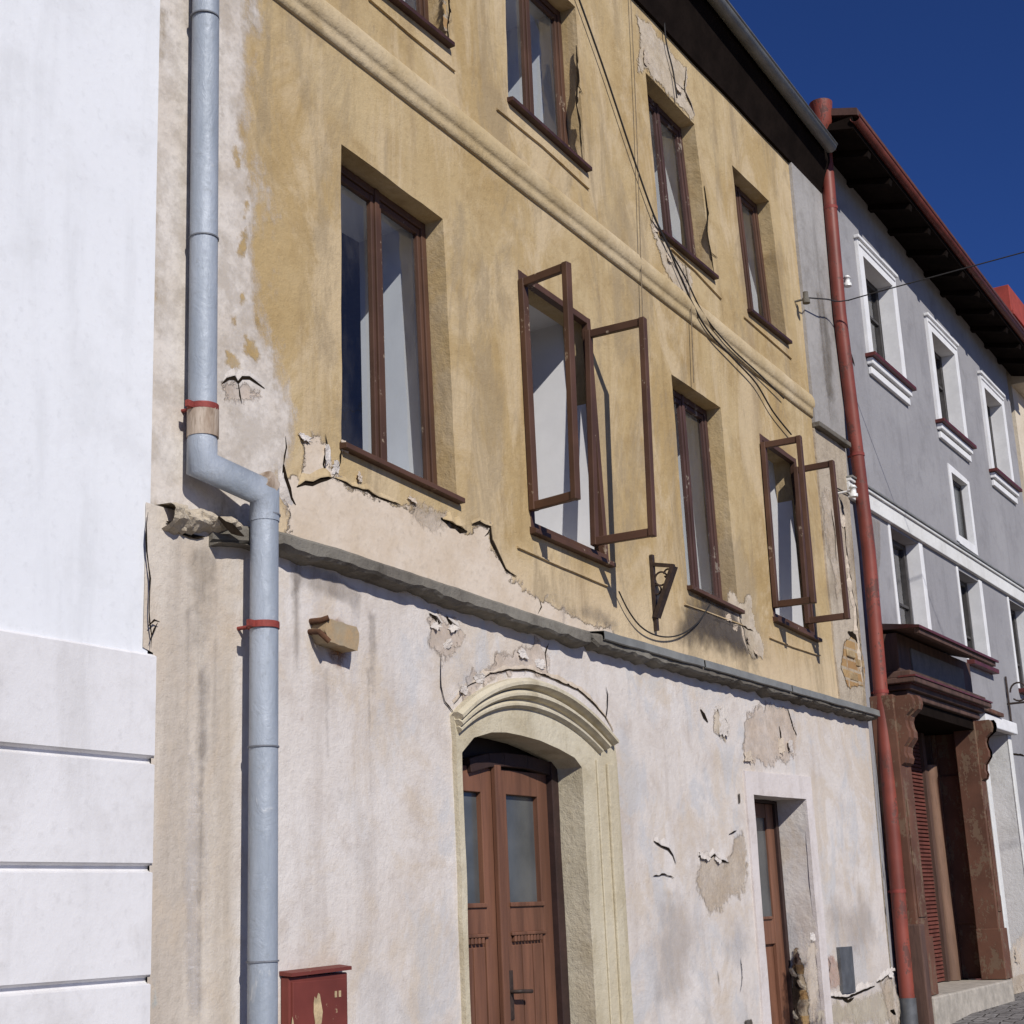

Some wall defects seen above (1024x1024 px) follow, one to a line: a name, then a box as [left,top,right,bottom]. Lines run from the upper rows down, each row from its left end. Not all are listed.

peeling [636,14,694,119]
peeling [150,0,250,539]
peeling [217,0,614,633]
crack [221,368,265,402]
peeling [428,610,466,666]
peeling [461,637,550,701]
peeling [725,590,764,659]
flaking render [841,637,865,689]
peeling [743,701,796,767]
crack [654,830,737,878]
peeling [697,832,749,913]
flaking render [789,932,840,1024]